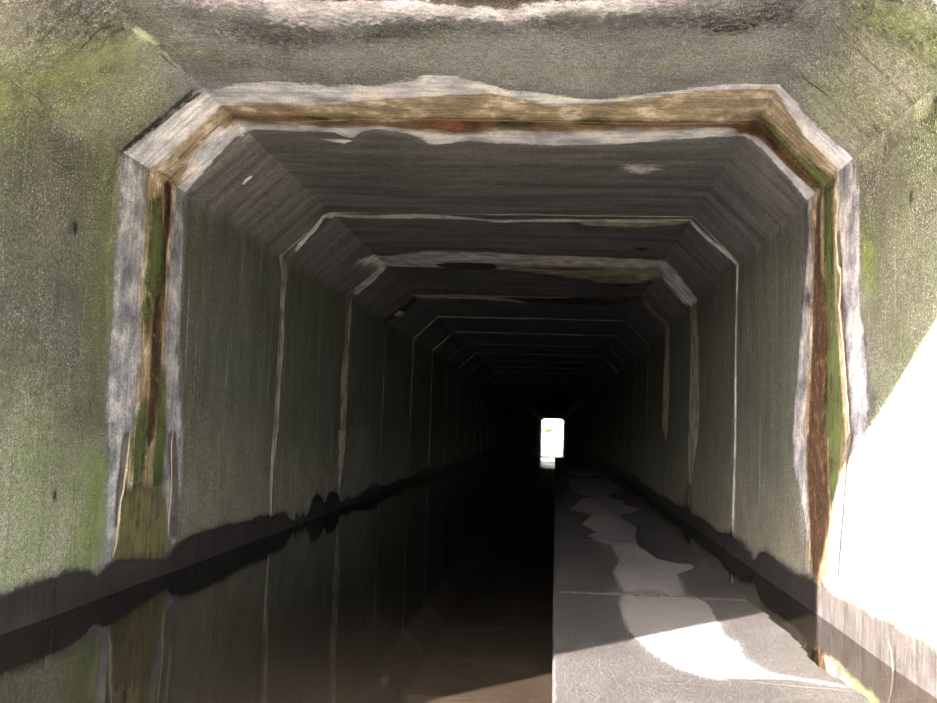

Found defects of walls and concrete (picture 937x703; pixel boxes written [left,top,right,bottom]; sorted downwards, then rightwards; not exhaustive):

damp [30,0,110,34]
damp [129,20,161,45]
damp [170,0,794,44]
corrosion [146,182,172,447]
damp [0,75,870,635]
corrosion [236,115,829,586]
damp [295,212,937,699]